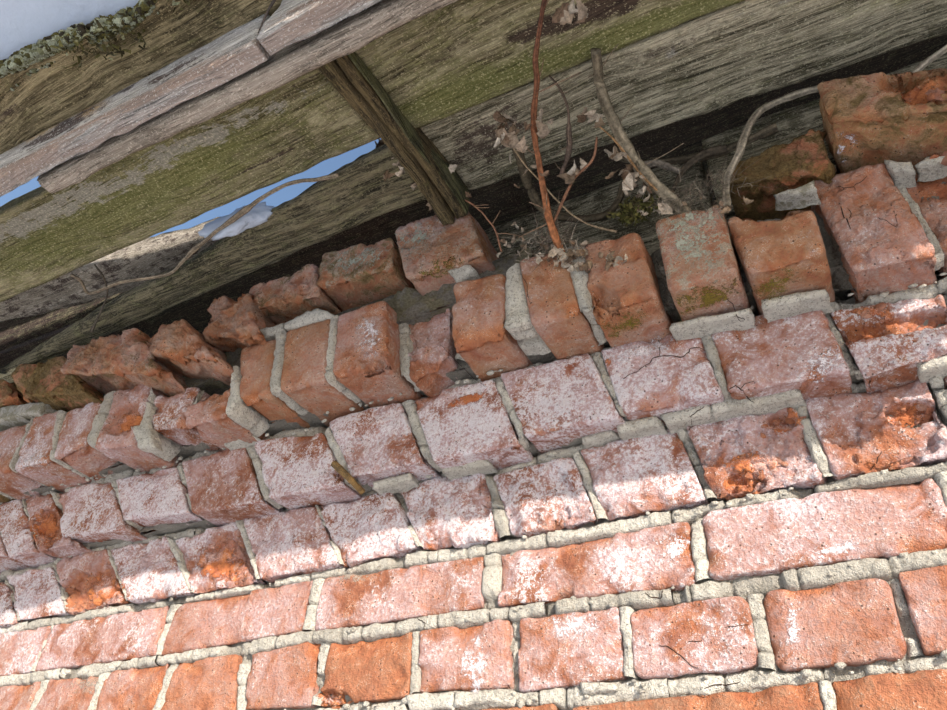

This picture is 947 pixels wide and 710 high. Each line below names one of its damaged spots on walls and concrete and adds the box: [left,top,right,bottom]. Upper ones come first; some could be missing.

spalling [897,79,945,105]
crack [623,340,702,379]
leakage [798,346,847,382]
spalling [883,403,932,429]
spalling [715,451,788,496]
spalling [197,544,250,592]
efflorescence [653,533,693,562]
efflorescence [811,540,859,560]
spalling [86,572,126,609]
efflorescence [552,614,598,638]
efflorescence [786,599,801,649]
efflorescence [461,635,487,695]